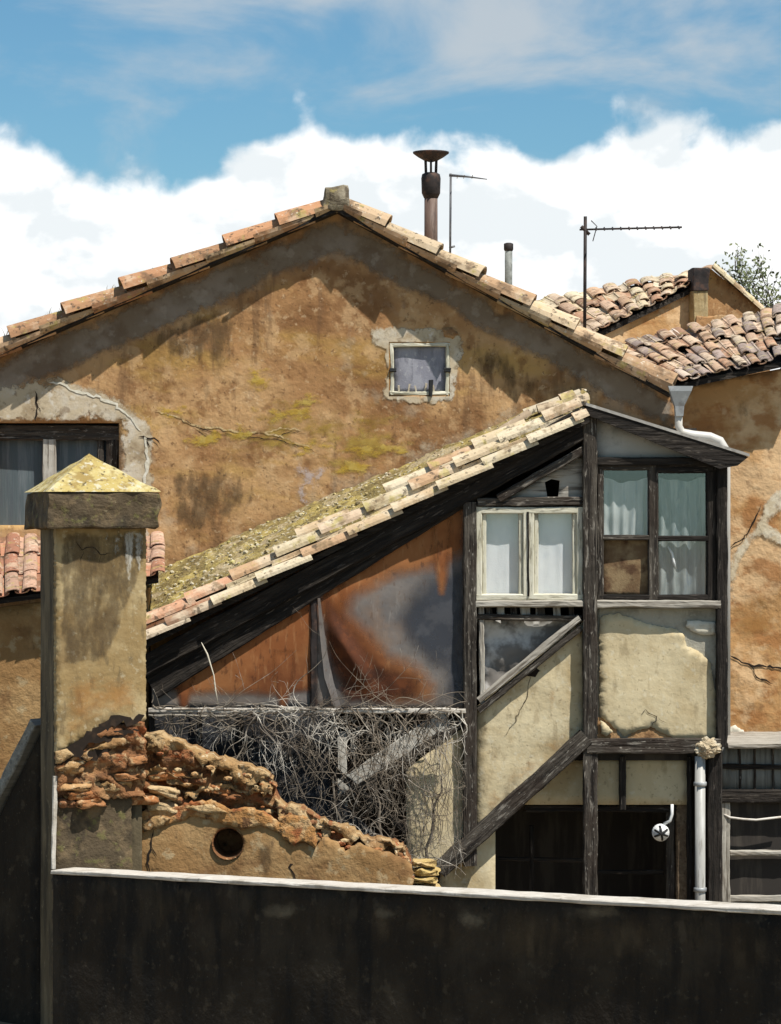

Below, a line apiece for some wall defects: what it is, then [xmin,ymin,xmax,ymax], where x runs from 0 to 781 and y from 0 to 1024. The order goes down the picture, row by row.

flaking render [371,326,464,404]
crack [139,411,317,453]
crack [730,506,761,548]
rust [176,509,463,707]
flaking render [599,609,716,674]
crack [730,655,781,684]
spalling [598,717,672,738]
spalling [54,737,132,777]
spalling [142,799,318,848]